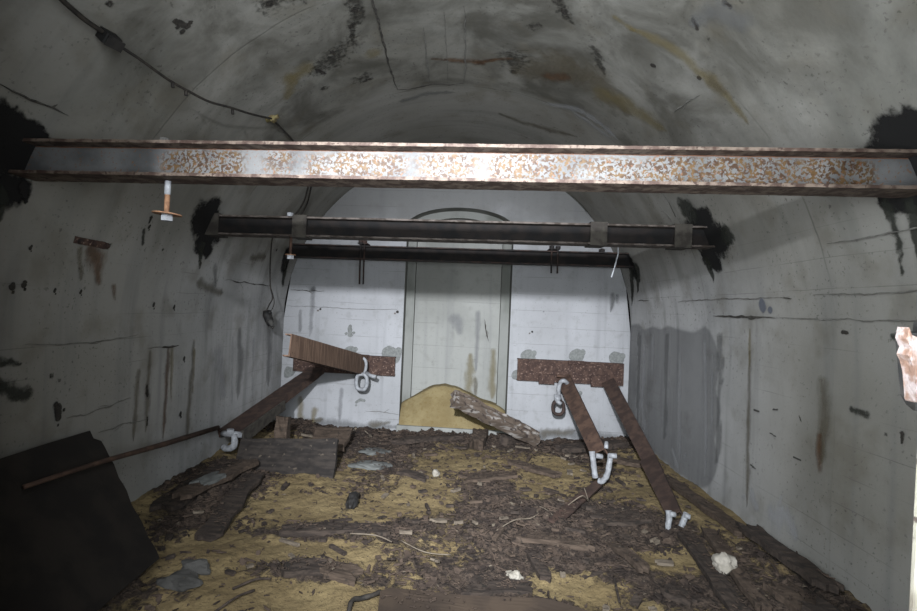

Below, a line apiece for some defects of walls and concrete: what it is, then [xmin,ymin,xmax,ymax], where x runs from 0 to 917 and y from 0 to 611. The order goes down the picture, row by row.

crack [371,0,466,90]
leakage [881,198,917,274]